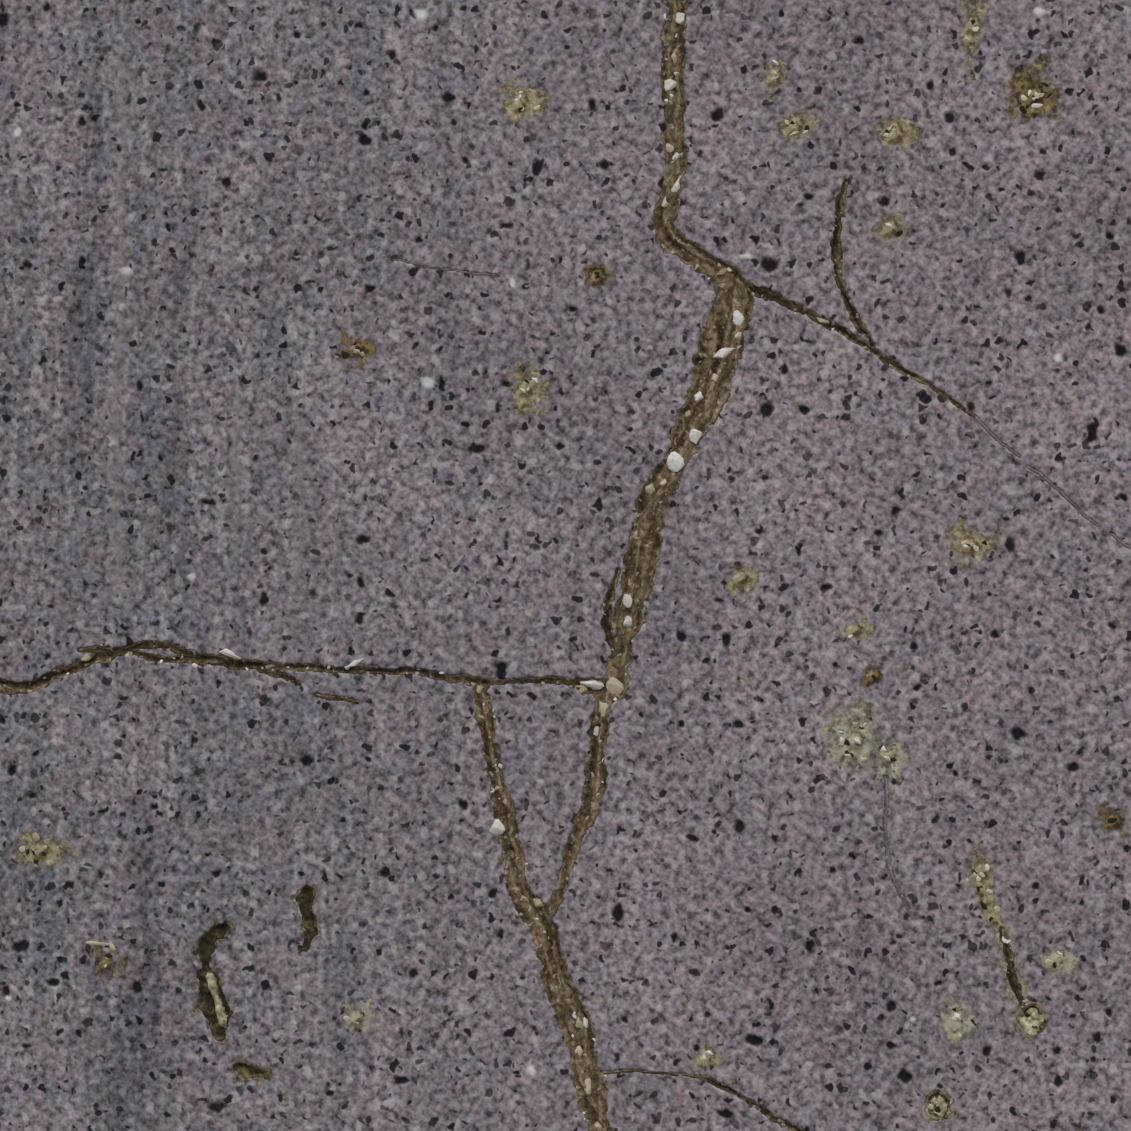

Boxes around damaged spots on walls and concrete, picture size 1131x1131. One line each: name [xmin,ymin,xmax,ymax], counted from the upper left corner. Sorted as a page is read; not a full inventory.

crack [383,258,500,277]
crack [1026,466,1131,550]
crack [473,0,1021,1131]
crack [0,640,607,695]
crack [314,693,359,704]
spalling [293,885,321,952]
spalling [192,919,234,1047]
crack [999,926,1027,1010]
spalling [233,1057,272,1086]
spalling [920,1089,957,1122]